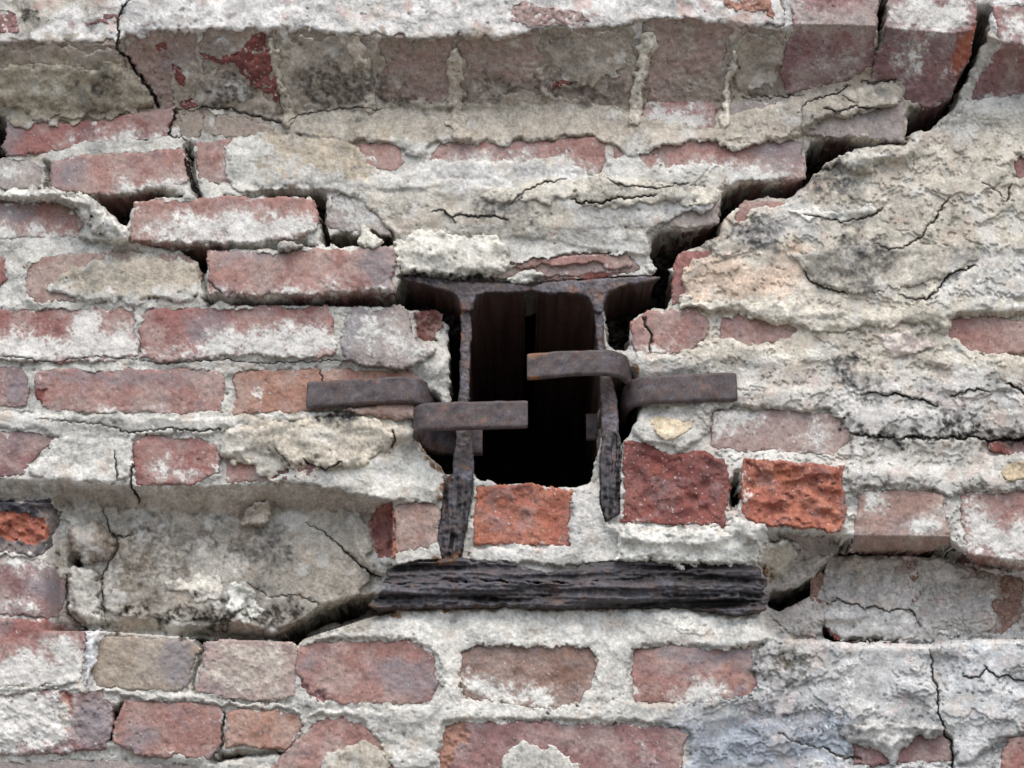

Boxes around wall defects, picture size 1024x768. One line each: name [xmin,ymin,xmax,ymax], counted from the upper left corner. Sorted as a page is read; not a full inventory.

spalling [200,33,280,103]
crack [116,1,201,197]
peeling [800,81,906,133]
crack [803,160,824,188]
crack [434,179,689,223]
peeling [788,203,877,225]
crack [652,250,685,275]
peeling [694,240,1024,358]
spalling [0,498,61,557]
peeling [164,572,264,624]
crack [768,590,921,626]
crack [930,654,954,768]